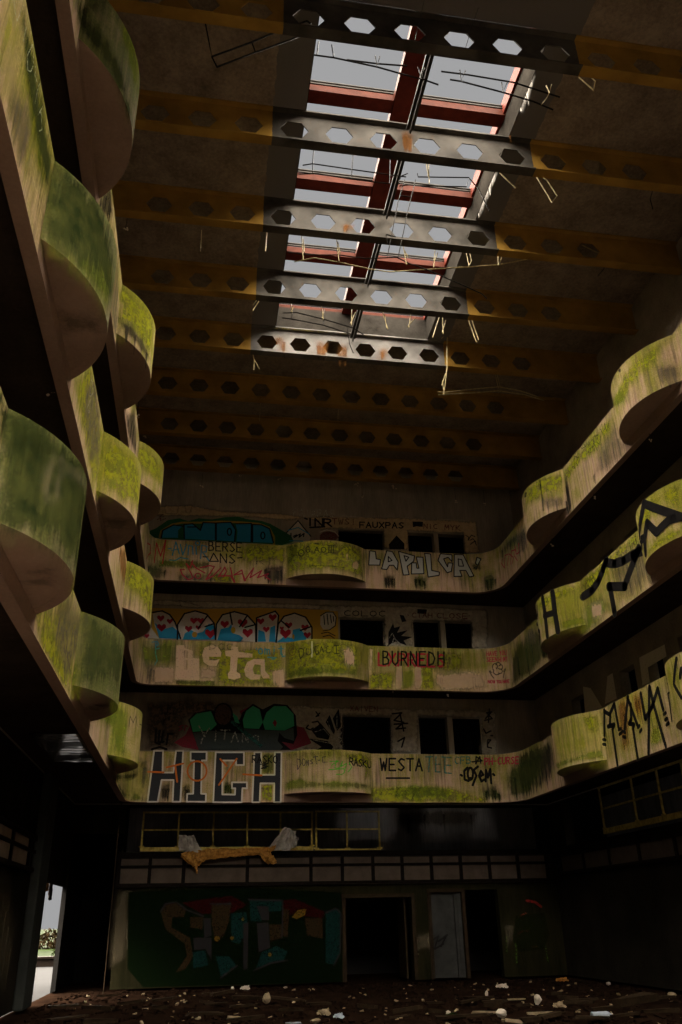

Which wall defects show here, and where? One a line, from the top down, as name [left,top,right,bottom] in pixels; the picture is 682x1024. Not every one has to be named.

water stain [484,743,553,801]